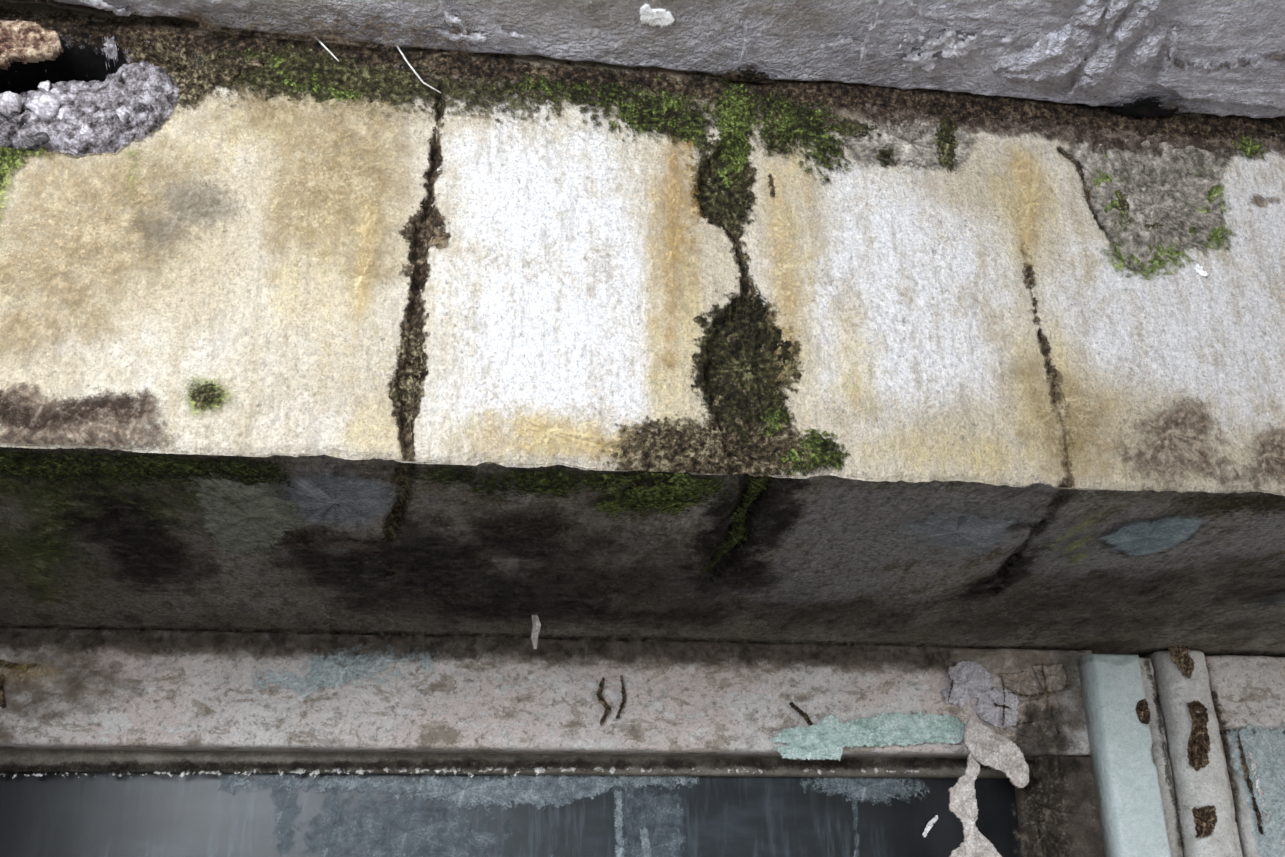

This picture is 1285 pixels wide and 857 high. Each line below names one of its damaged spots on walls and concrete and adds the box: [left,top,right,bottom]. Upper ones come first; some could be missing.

spalling [0,31,266,158]
spalling [1057,137,1236,280]
crack [382,87,451,545]
crack [595,77,850,595]
damp [0,382,173,448]
crack [958,244,1076,601]
damp [1119,390,1285,518]
damp [4,478,220,609]
damp [0,508,1285,675]
peeling [112,768,261,777]
peeling [278,766,766,778]
peeling [770,660,1067,857]